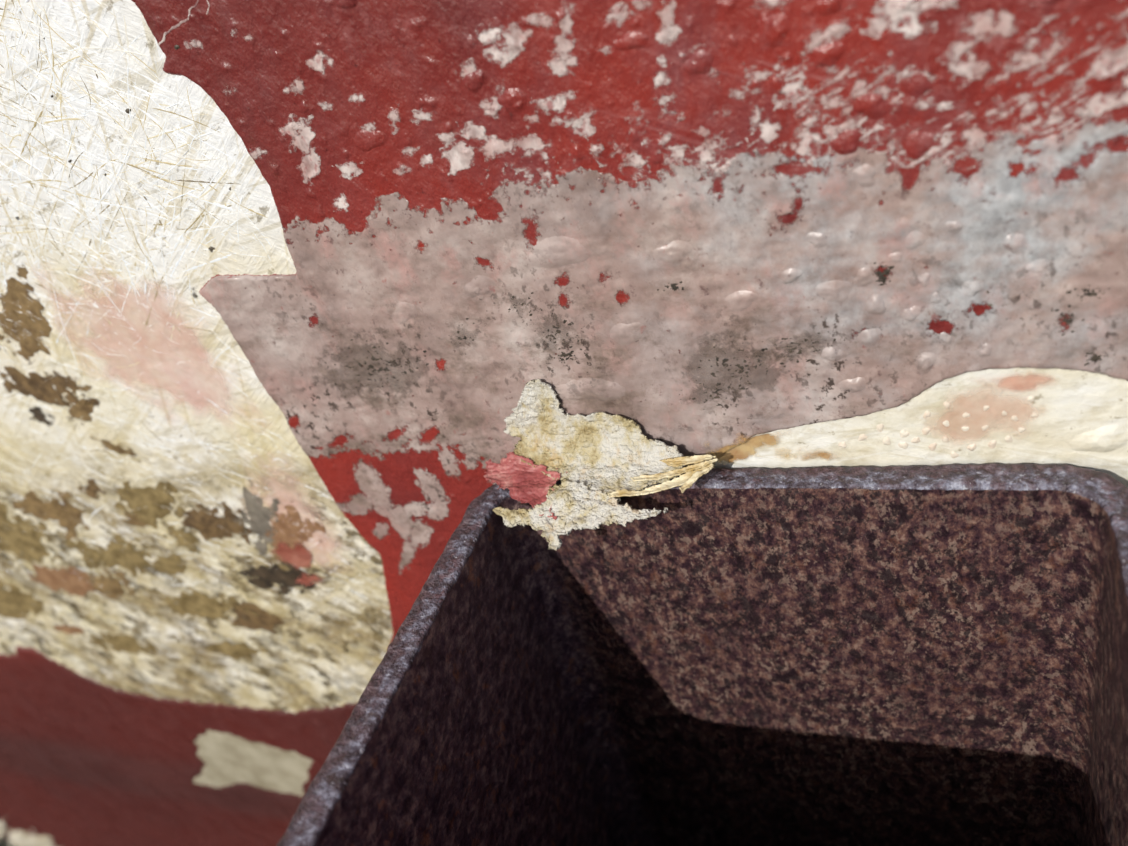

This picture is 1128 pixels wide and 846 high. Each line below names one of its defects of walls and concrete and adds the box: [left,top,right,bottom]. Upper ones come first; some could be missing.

crack [158,0,210,45]
peeling [461,4,577,77]
peeling [607,0,682,44]
peeling [801,0,958,54]
peeling [941,10,1014,89]
peeling [991,16,1072,96]
peeling [200,44,1128,550]
peeling [0,0,451,713]
peeling [193,730,314,797]